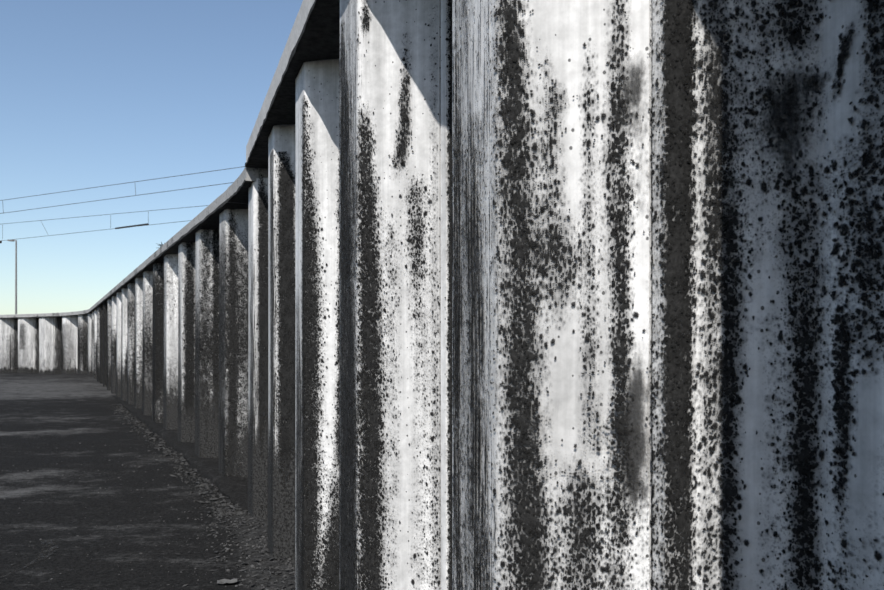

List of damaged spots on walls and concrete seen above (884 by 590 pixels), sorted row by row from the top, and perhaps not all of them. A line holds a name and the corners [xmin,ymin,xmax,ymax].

water stain [621,65,650,129]
water stain [754,74,825,177]
water stain [619,362,649,507]